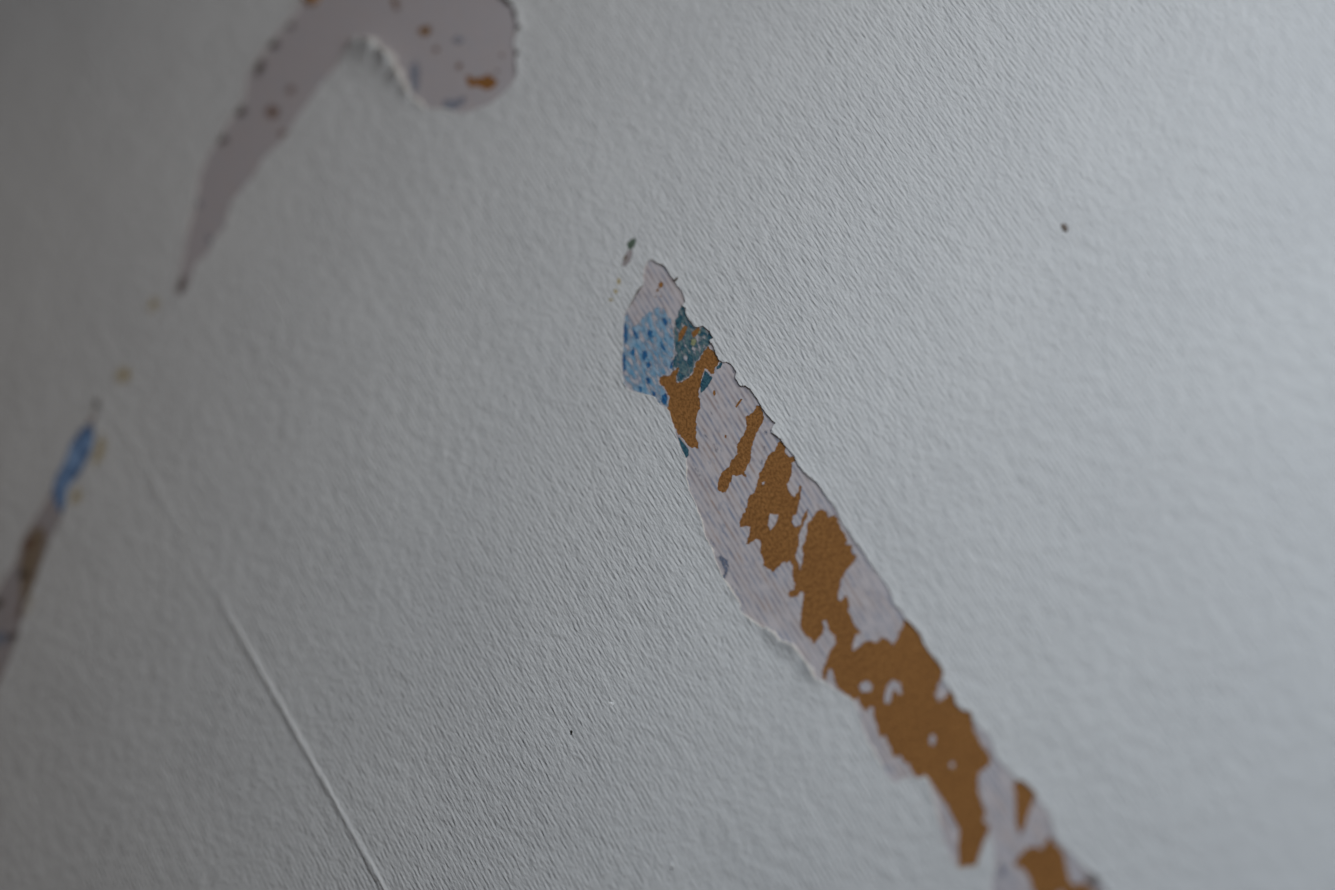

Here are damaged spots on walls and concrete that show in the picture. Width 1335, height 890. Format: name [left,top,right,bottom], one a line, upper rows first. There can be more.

peeling [768,514,778,530]
peeling [859,680,902,703]